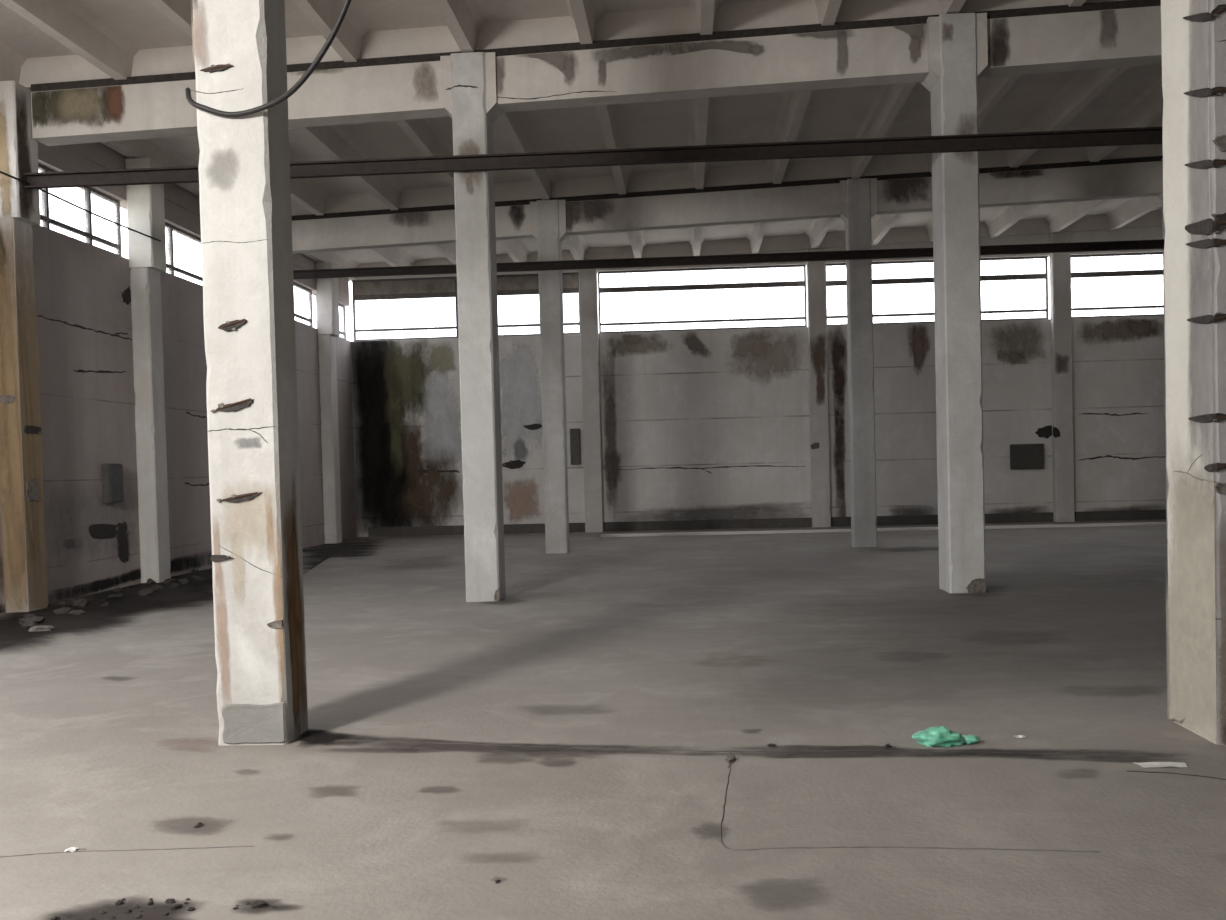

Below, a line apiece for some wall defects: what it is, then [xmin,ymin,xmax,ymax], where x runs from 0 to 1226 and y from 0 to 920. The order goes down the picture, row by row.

rust [107,86,124,118]
crack [37,315,132,340]
water stain [610,335,662,355]
spalling [211,398,254,412]
crack [186,412,275,443]
water stain [302,340,457,573]
water stain [604,379,620,503]
crack [620,465,805,474]
crack [1079,455,1218,483]
spalling [216,492,262,503]
rust [267,505,307,724]
water stain [1218,620,1226,743]